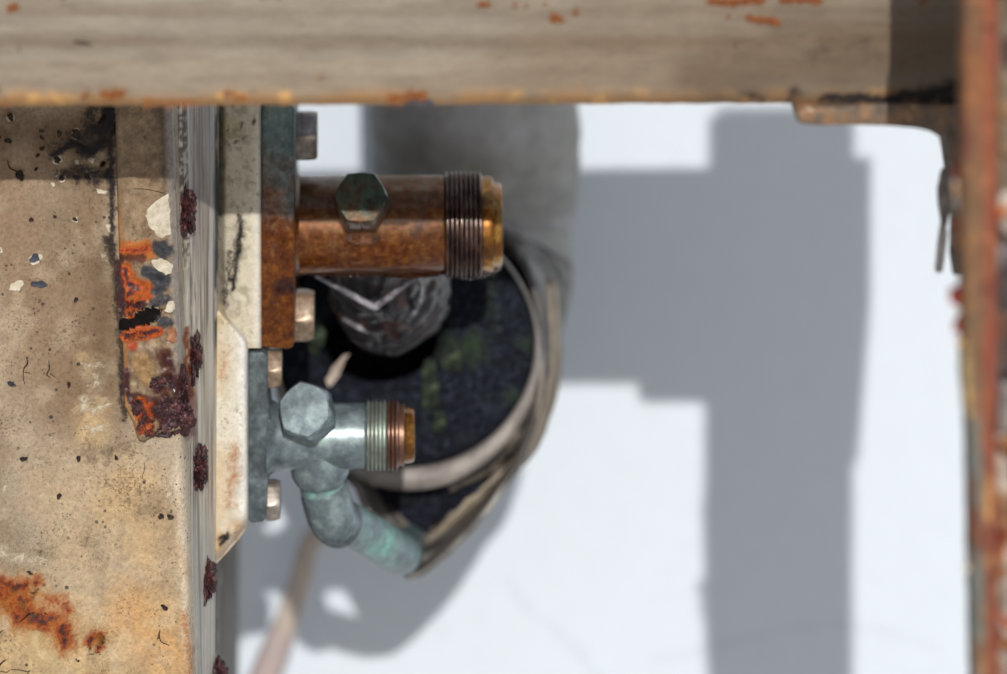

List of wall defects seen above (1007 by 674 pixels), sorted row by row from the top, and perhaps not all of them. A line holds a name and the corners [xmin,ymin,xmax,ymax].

corrosion [706,0,781,26]
leakage [48,105,128,422]
peeling [151,258,173,275]
corrosion [0,574,106,656]